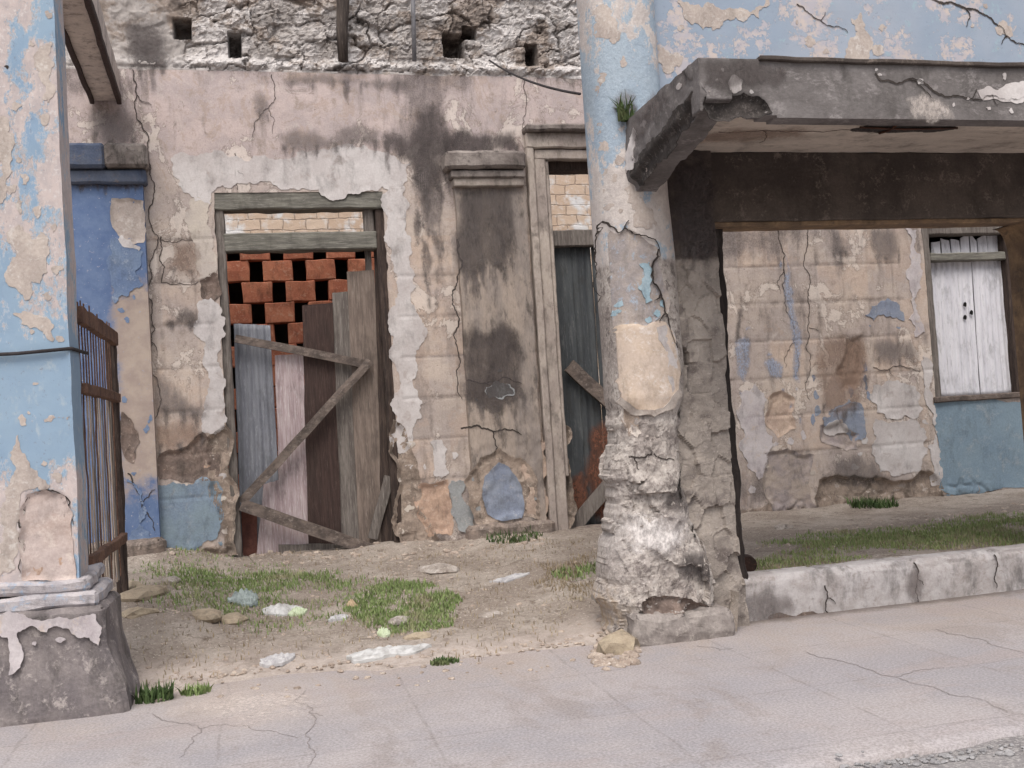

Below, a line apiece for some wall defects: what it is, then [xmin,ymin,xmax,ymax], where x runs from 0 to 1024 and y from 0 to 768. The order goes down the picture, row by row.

peeling [845,12,886,76]
crack [875,73,1022,105]
crack [935,0,1024,45]
peeling [106,198,146,323]
crack [132,70,197,418]
damp [286,106,517,291]
crack [593,220,678,348]
spalling [0,411,77,581]
damp [464,324,525,425]
rust [572,423,608,511]
peeling [749,354,1024,511]
spalling [642,595,712,614]